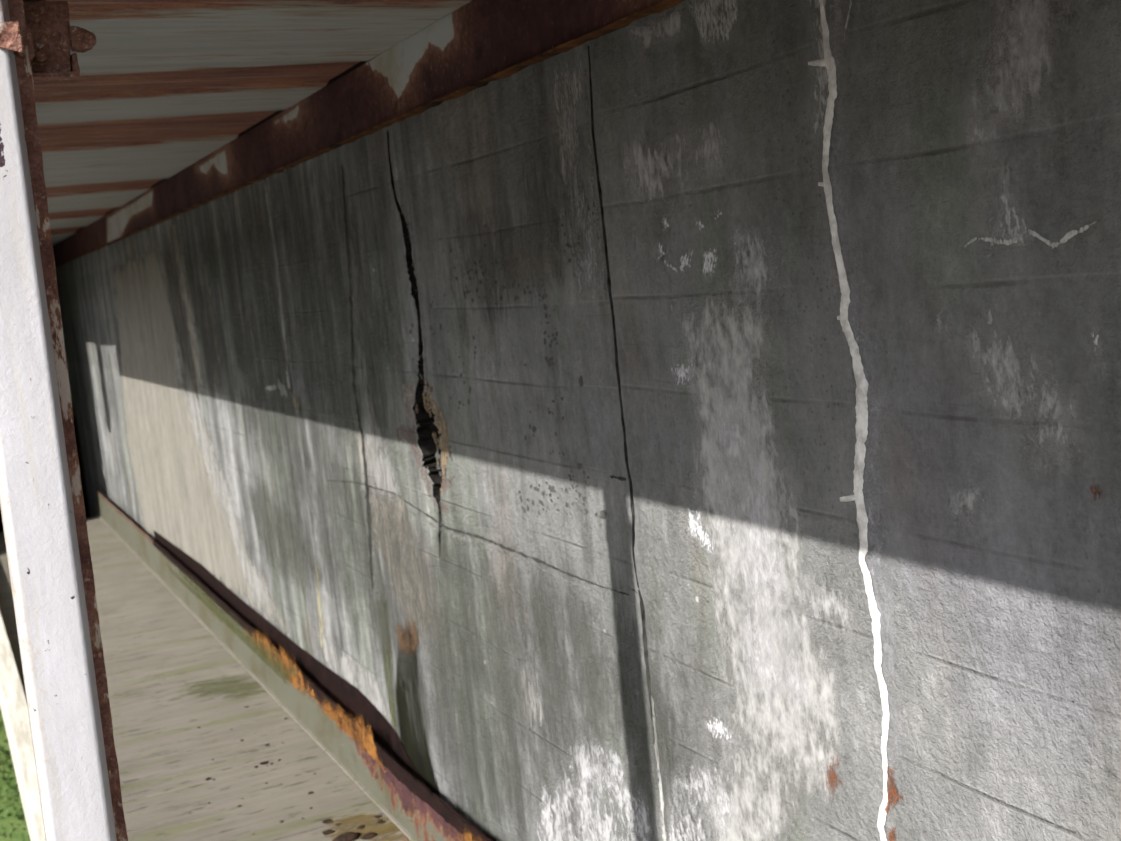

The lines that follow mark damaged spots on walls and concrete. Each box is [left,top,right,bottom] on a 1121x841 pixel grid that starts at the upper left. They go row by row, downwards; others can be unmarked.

corrosion [55,0,685,267]
damp [735,234,771,297]
corrosion [152,540,491,841]
spalling [435,445,453,483]
crack [328,46,667,841]
damp [618,299,848,841]
crack [808,0,889,841]